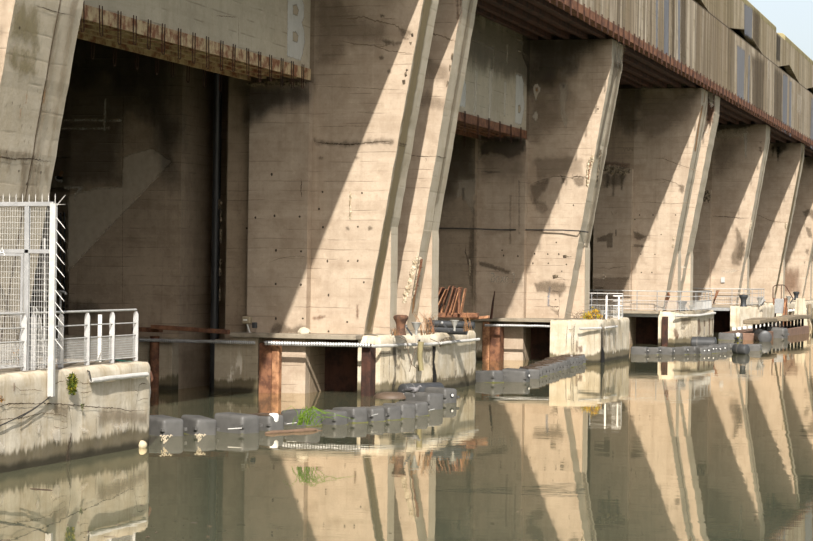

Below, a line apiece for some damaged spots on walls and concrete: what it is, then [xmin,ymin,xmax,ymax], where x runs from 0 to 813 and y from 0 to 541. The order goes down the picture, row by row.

leakage [14,6,37,38]
corrosion [695,88,715,151]
crack [319,126,446,158]
crack [0,155,48,163]